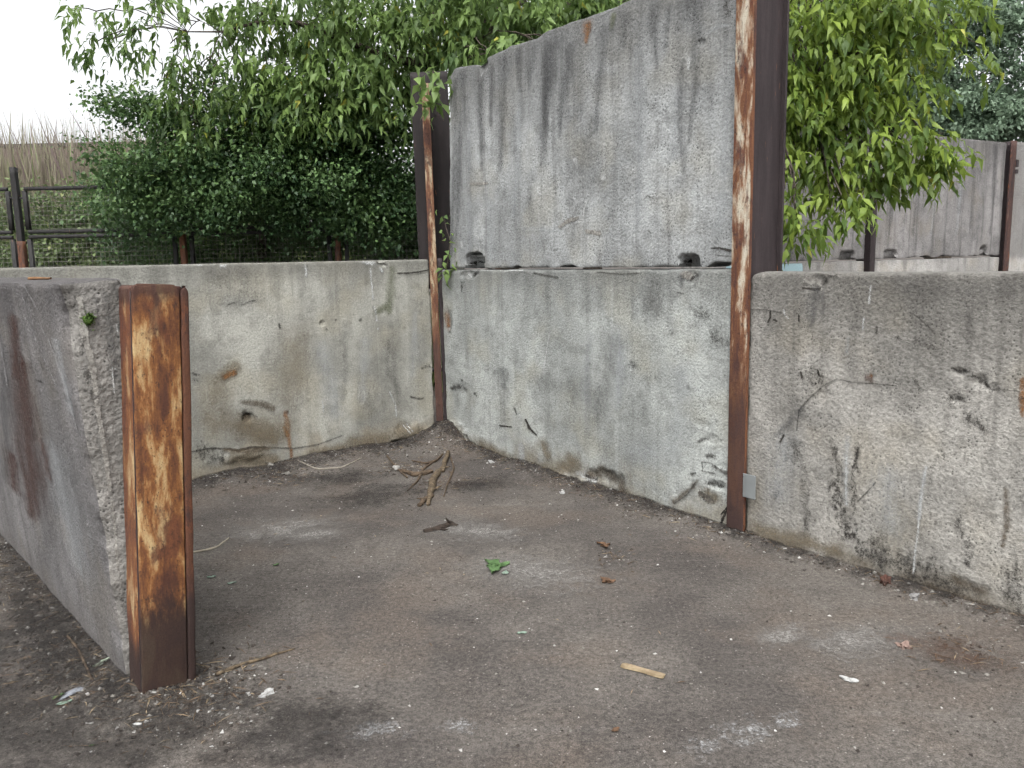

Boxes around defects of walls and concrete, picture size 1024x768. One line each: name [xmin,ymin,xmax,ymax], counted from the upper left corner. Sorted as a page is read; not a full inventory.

corrosion [7,316,51,518]
leakage [825,442,1024,614]